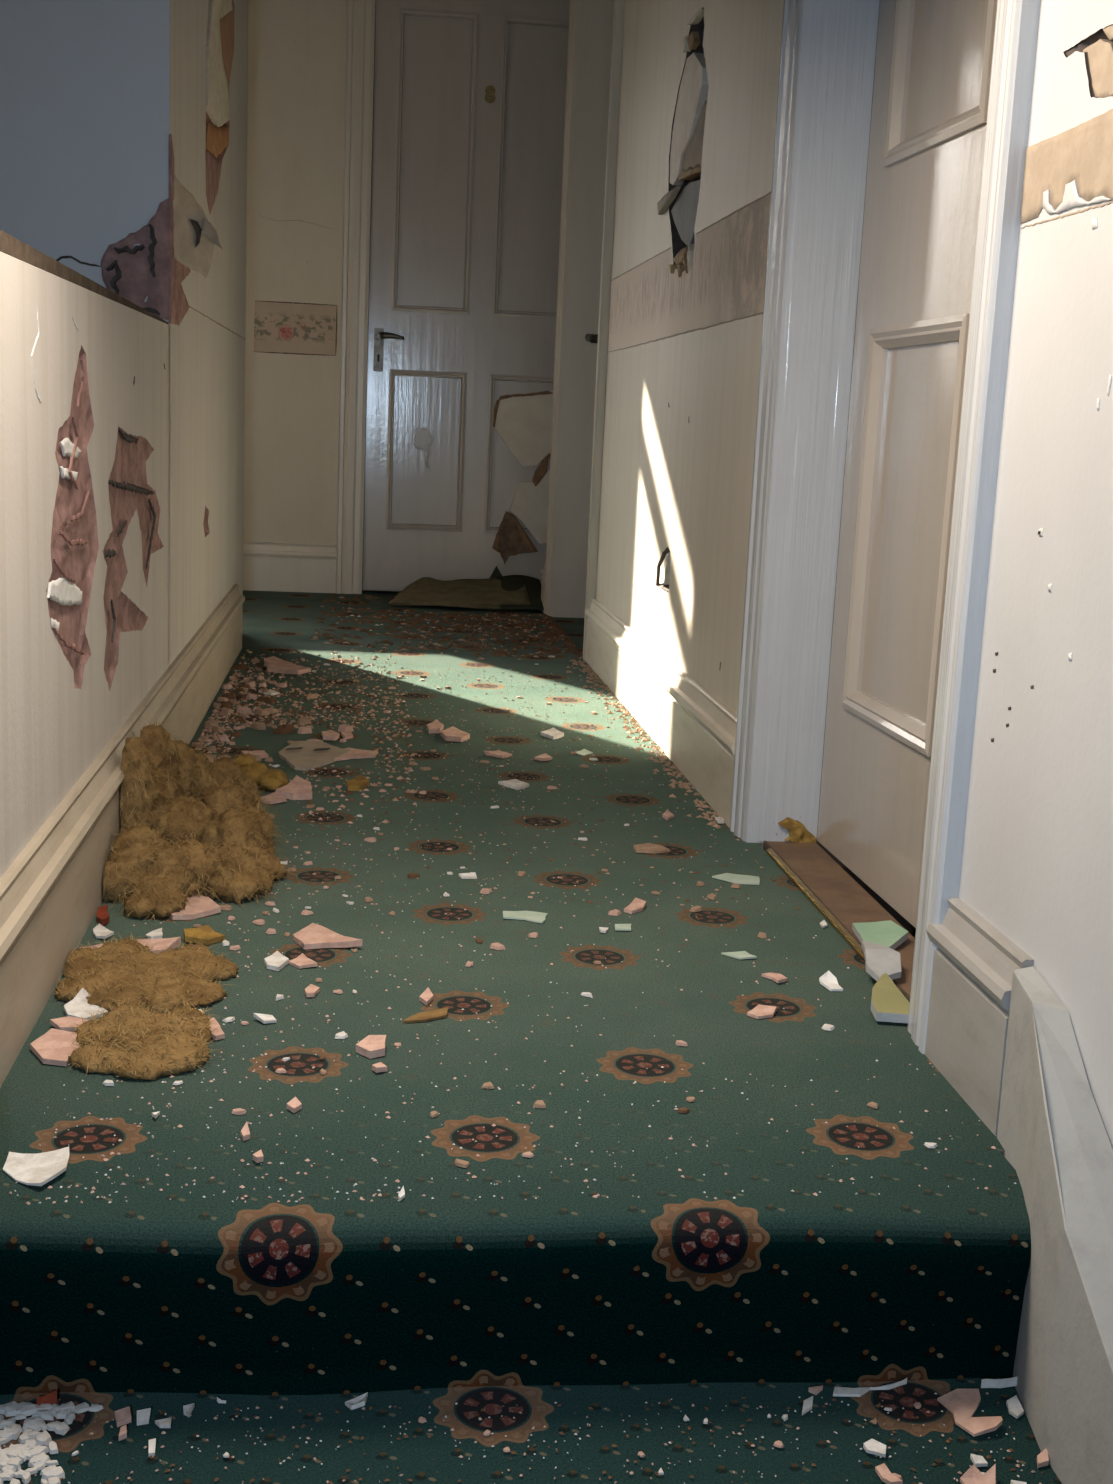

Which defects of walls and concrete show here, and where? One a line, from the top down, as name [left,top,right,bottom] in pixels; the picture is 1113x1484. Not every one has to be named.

flaking render [101,134,191,326]
spalling [657,9,709,277]
peeling [1020,25,1113,230]
flaking render [46,345,164,691]